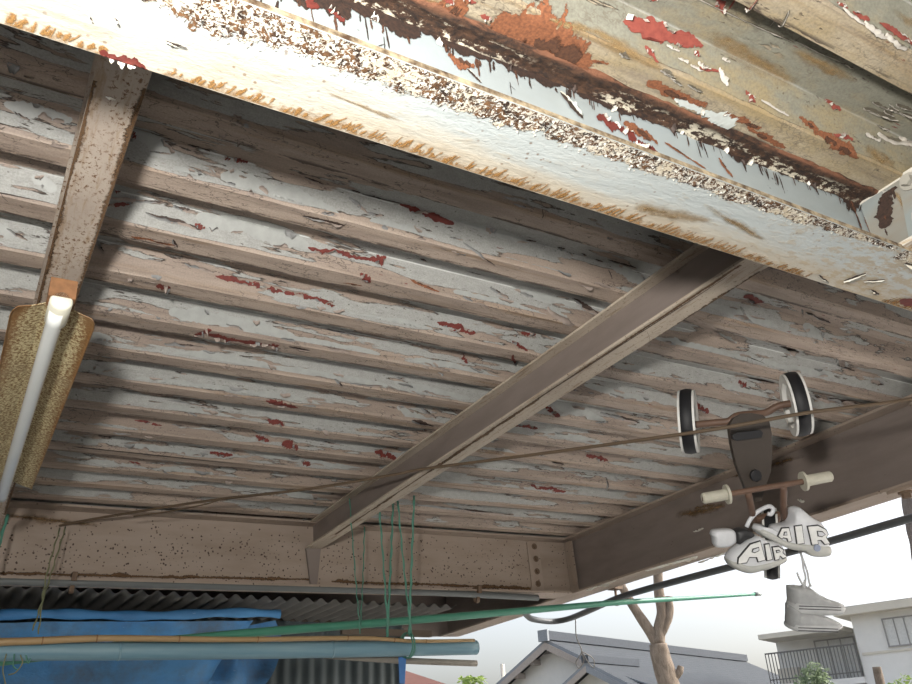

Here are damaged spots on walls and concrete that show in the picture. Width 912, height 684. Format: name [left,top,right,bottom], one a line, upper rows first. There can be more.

peeling [99,49,147,70]
peeling [4,101,73,148]
peeling [108,0,912,269]
corrosion [294,0,902,235]
peeling [185,263,335,307]
peeling [453,286,598,326]
peeling [844,273,885,295]
peeling [124,305,476,400]
peeling [655,333,856,377]
peeling [135,371,321,408]
peeling [95,420,233,458]
peeling [263,439,365,469]